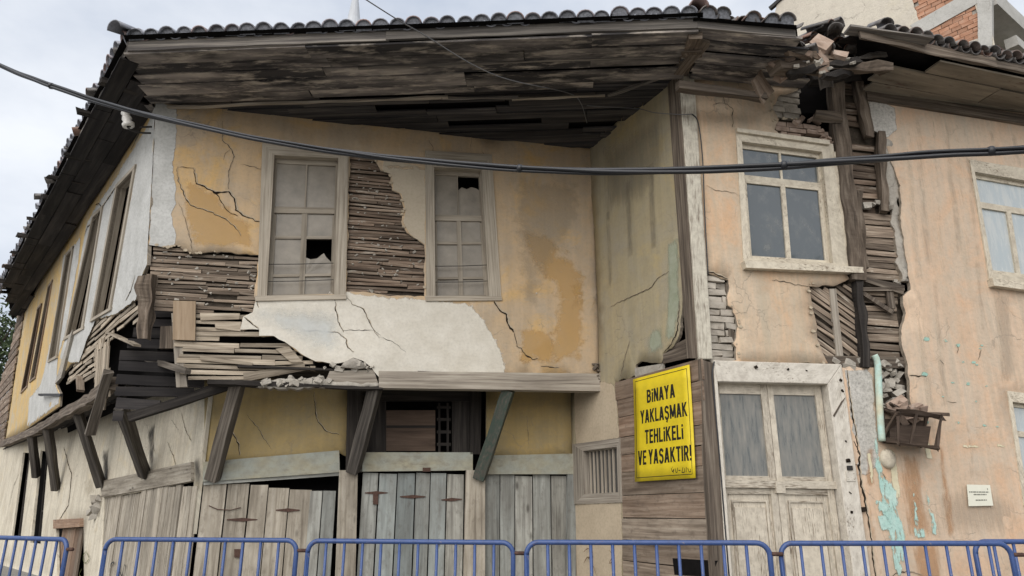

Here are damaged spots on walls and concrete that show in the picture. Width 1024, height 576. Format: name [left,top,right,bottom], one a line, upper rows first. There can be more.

spalling [770,86,832,144]
crack [176,121,259,248]
flaking render [27,103,505,426]
crack [331,298,400,352]
crack [494,301,559,368]
water stain [522,235,581,360]
spalling [707,275,743,362]
spalling [806,82,902,364]
crack [847,373,921,576]
flaking render [845,369,937,575]